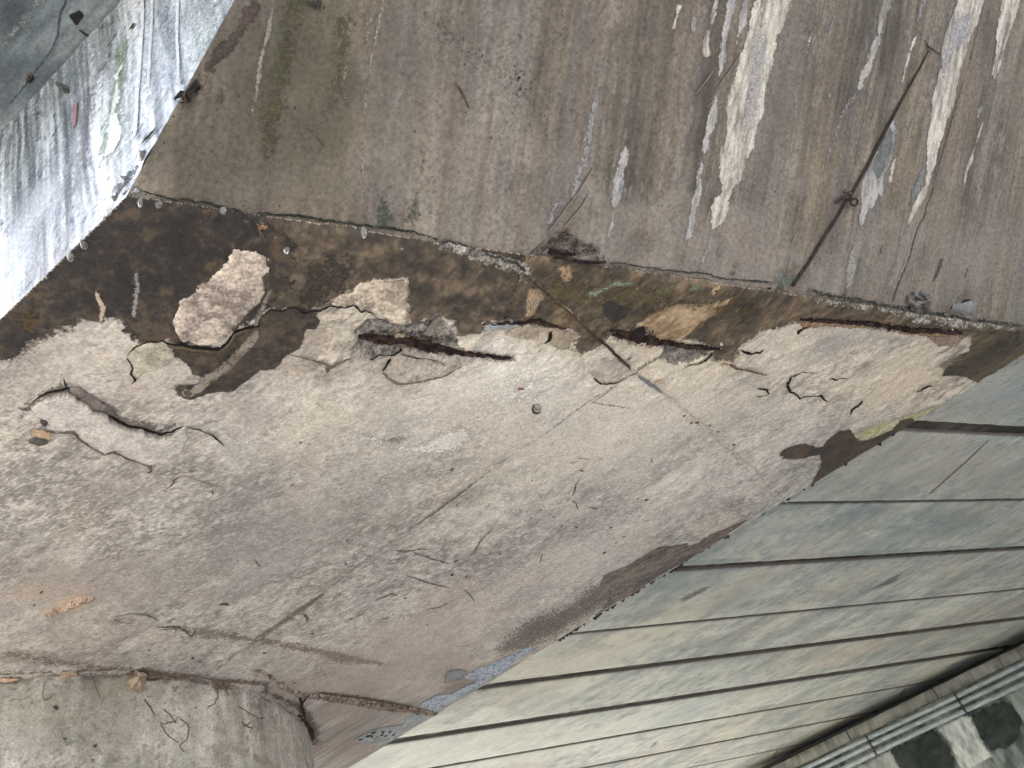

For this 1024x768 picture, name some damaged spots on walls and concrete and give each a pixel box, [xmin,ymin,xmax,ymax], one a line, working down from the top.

efflorescence [992,0,1020,80]
leakage [683,0,793,257]
efflorescence [858,118,914,225]
efflorescence [900,0,985,246]
crack [19,379,224,495]
peeling [127,249,269,378]
crack [126,305,402,384]
spalling [111,149,772,368]
corrosion [501,254,1022,368]
crack [729,350,863,416]
spalling [798,288,1024,347]
leakage [355,520,747,747]